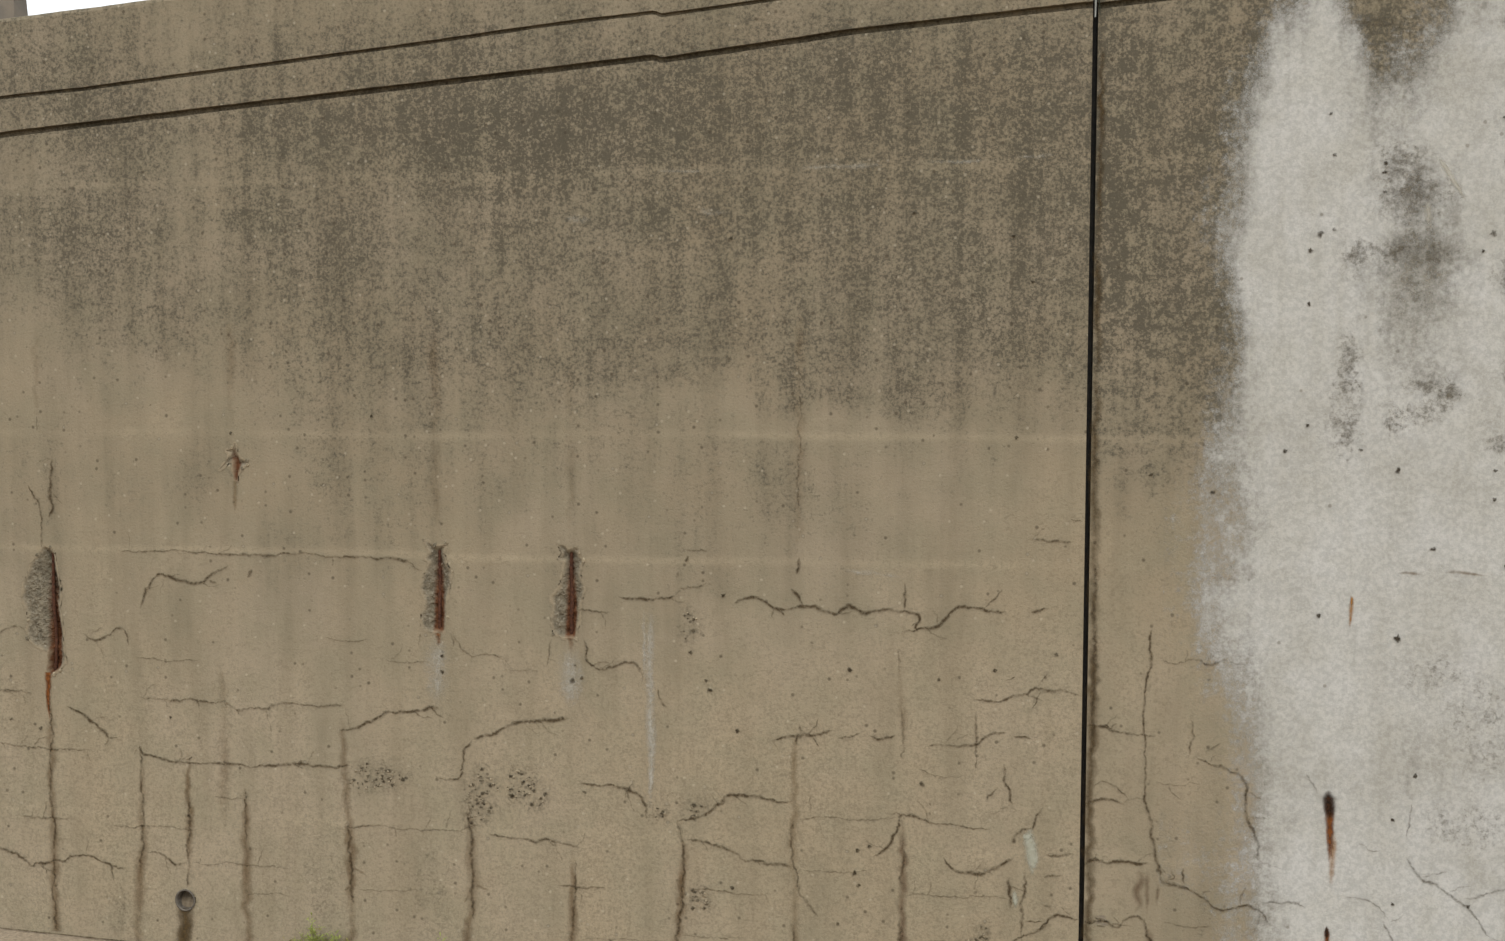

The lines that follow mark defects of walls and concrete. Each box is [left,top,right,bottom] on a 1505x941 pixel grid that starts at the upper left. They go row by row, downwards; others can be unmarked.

spalling [21,545,68,714]